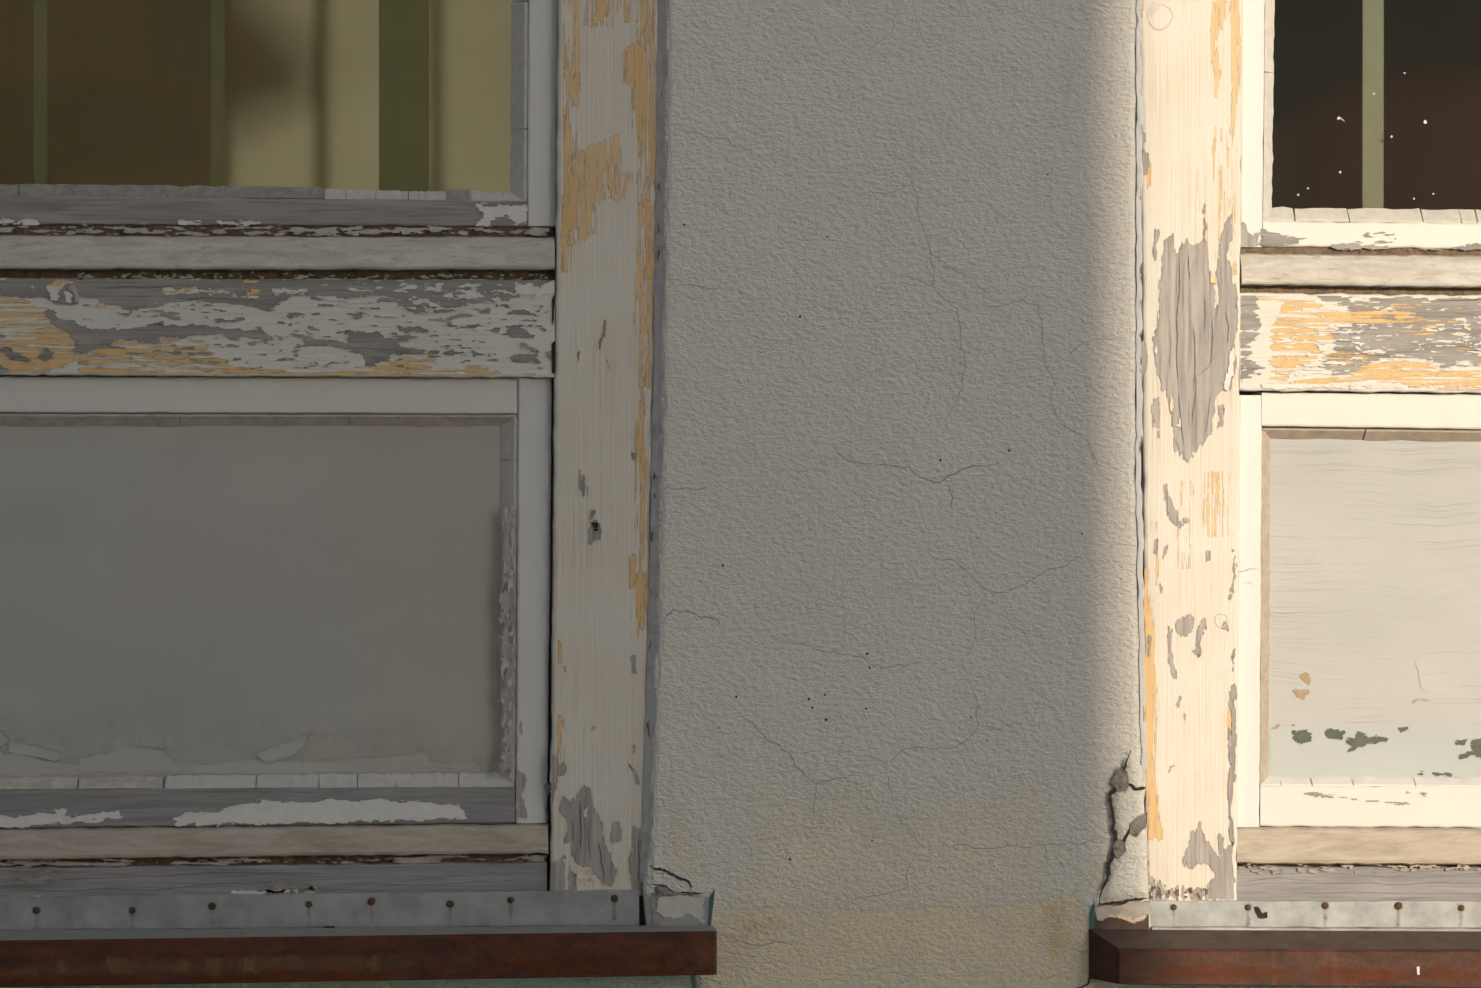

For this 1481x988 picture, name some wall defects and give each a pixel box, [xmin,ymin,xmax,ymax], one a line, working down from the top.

peeling [0,808,123,828]
peeling [0,0,657,637]
peeling [170,506,706,924]
crack [643,811,703,894]
crack [646,424,723,739]
crack [657,181,725,290]
crack [747,451,1001,510]
crack [719,527,1149,987]
crack [873,165,1143,496]
peeling [1112,470,1237,859]
peeling [1141,0,1481,462]
peeling [1269,723,1481,806]